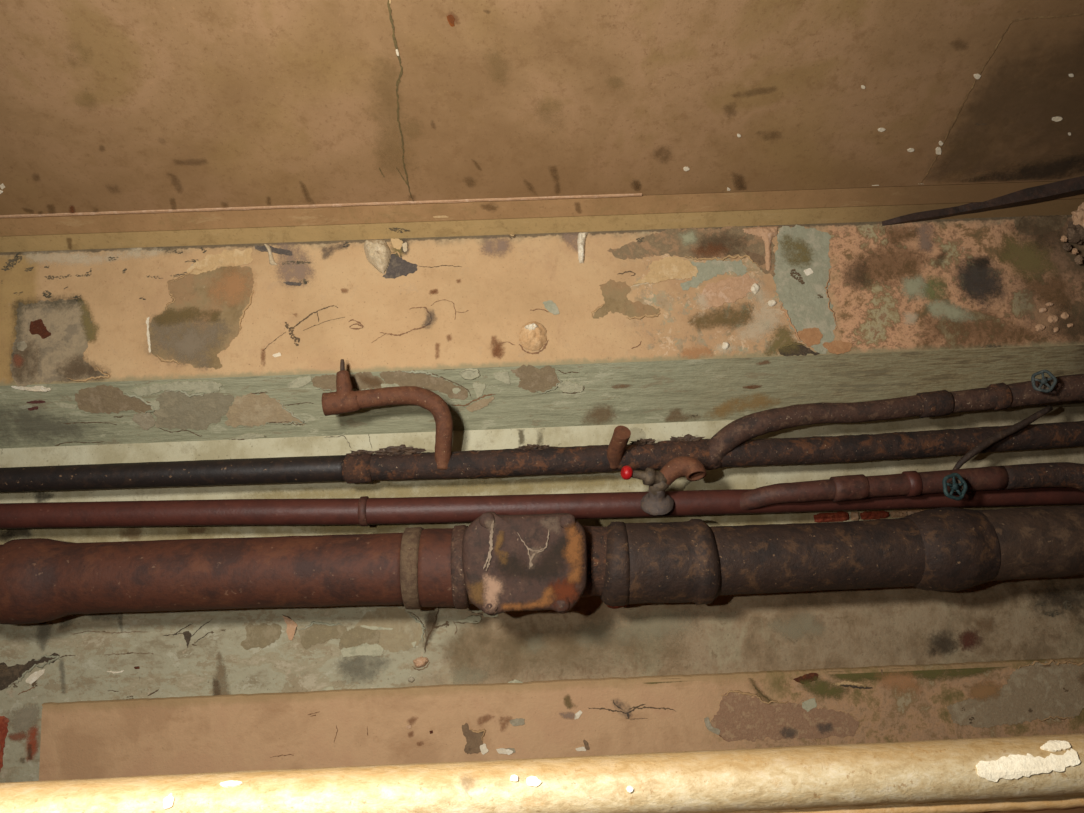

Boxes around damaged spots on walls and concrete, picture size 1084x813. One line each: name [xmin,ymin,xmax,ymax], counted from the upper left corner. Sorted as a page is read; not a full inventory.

crack [379,0,412,198]
flaking render [383,240,461,279]
peeling [591,225,852,356]
damp [846,217,1084,348]
peeling [10,244,314,440]
peeling [287,374,336,392]
peeling [350,364,585,412]
flaking render [0,707,38,771]
flaking render [0,653,76,695]
peeling [704,680,859,742]
flaking render [947,659,1084,728]